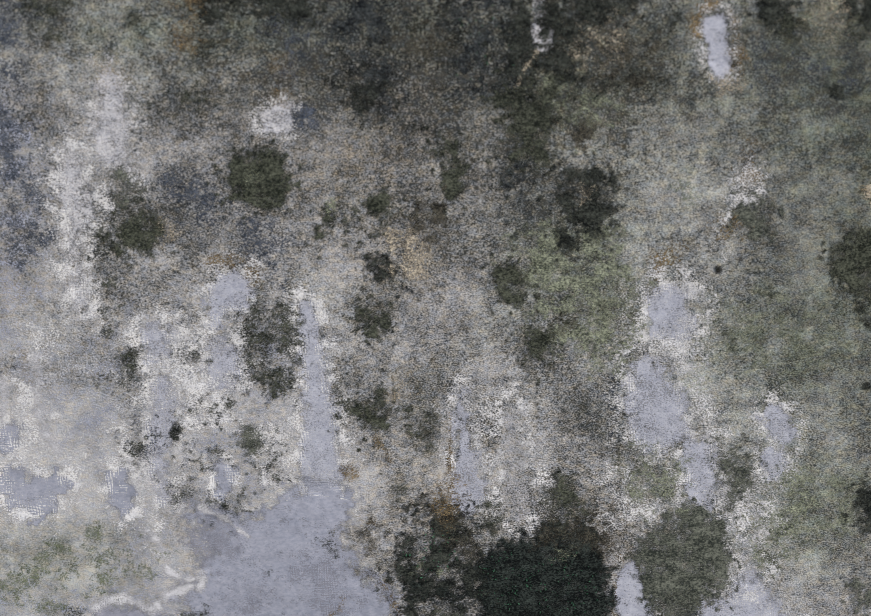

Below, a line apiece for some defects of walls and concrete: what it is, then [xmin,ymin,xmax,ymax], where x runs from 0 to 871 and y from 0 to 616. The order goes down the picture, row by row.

leakage [0,0,309,616]
leakage [166,0,682,386]
leakage [315,312,778,616]
leakage [818,218,871,339]